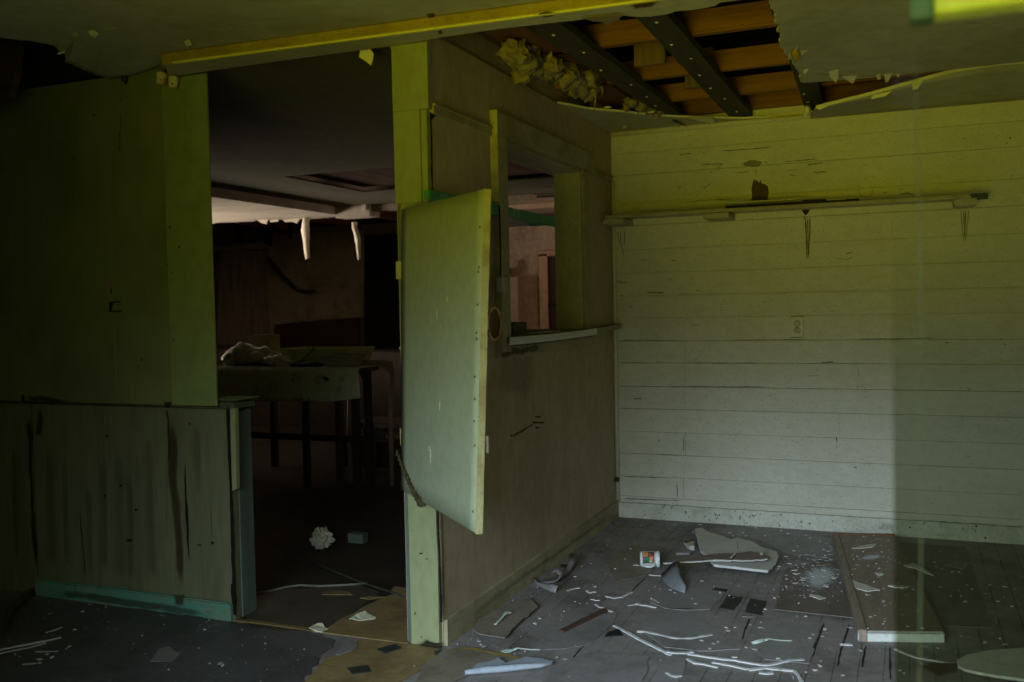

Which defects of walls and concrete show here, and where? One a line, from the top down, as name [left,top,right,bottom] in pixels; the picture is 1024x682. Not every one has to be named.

peeling [823,69,857,84]